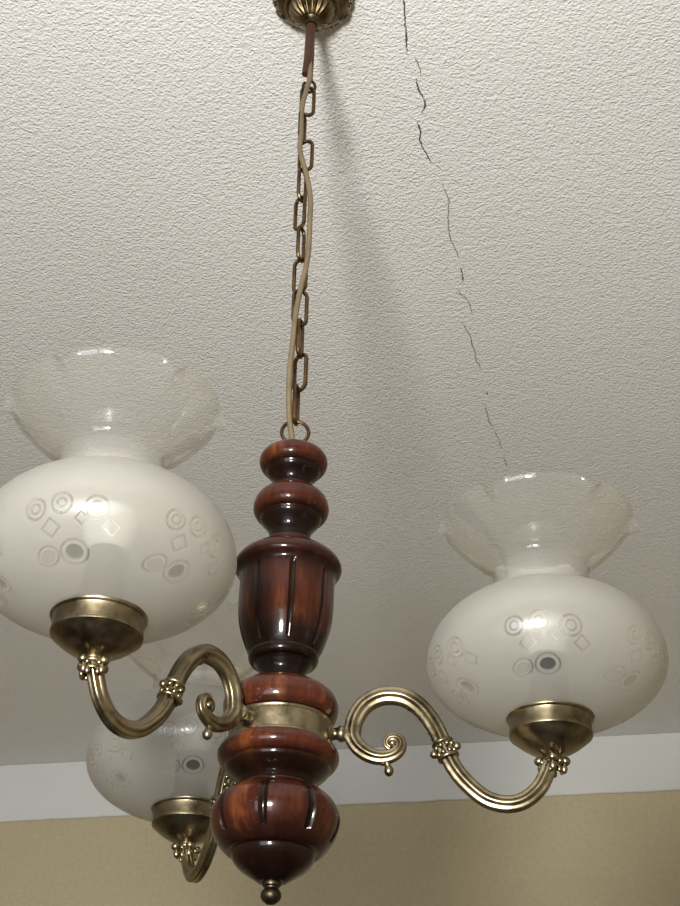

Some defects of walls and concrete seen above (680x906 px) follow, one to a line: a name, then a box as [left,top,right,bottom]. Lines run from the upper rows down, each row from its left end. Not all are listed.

crack [403,0,480,367]